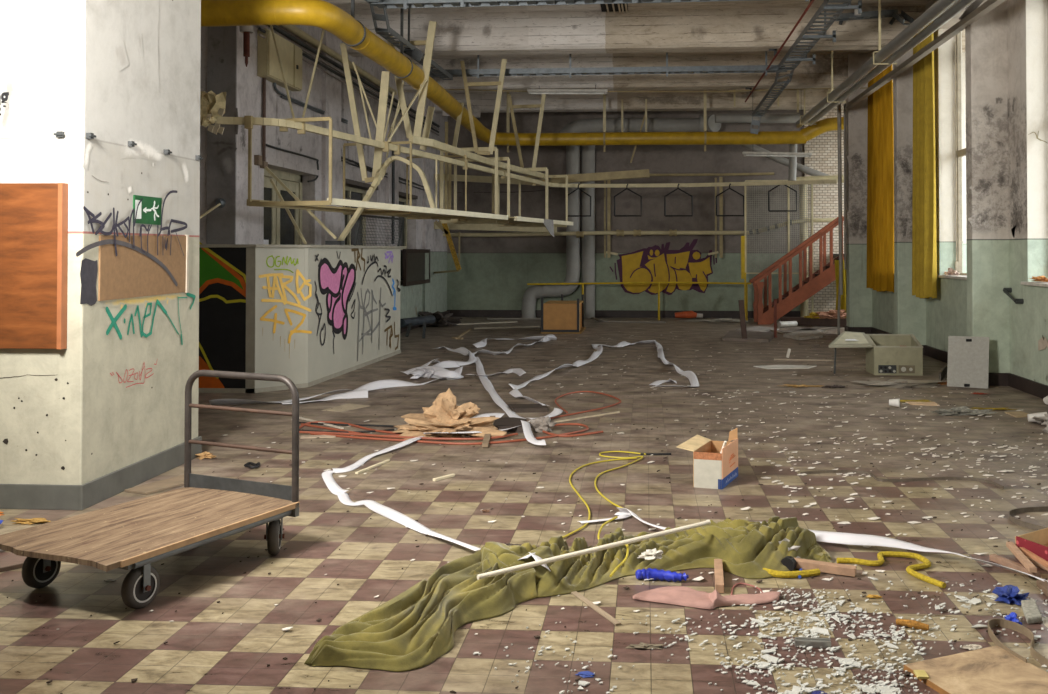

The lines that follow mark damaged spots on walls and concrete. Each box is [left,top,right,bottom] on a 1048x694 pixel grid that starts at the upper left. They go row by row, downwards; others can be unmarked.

mould [980,92,1017,123]
mould [968,155,1026,240]